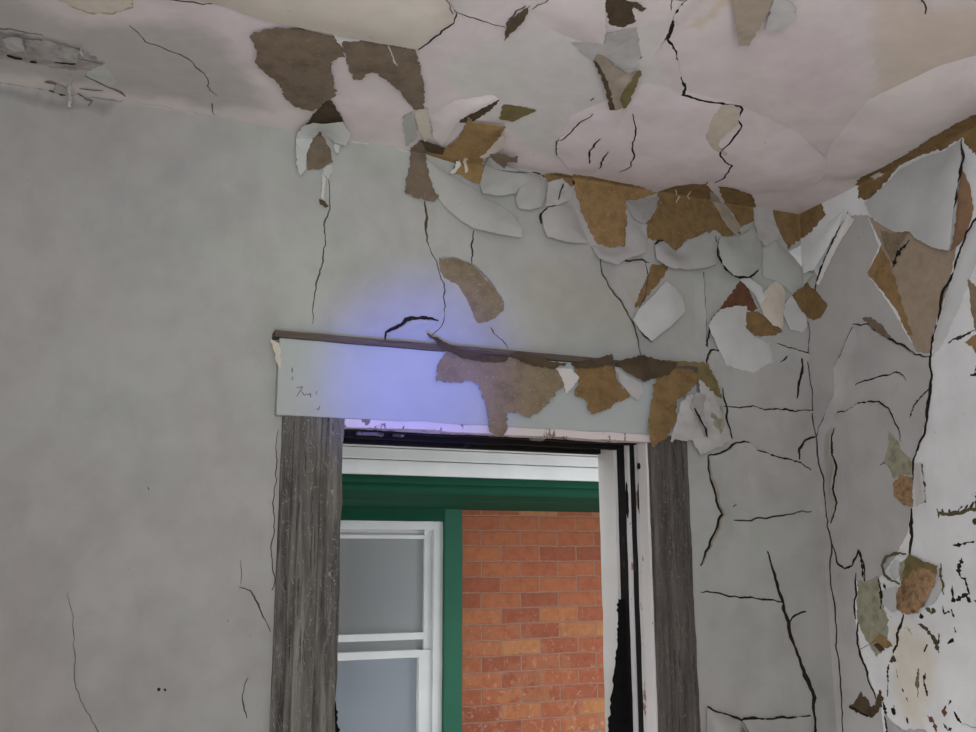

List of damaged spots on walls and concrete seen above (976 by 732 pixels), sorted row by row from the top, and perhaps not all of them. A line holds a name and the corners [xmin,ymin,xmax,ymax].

flaking render [0,28,126,122]
crack [129,25,217,116]
peeling [250,27,536,245]
crack [654,0,744,184]
crack [954,139,965,206]
crack [312,180,331,324]
crack [384,245,446,341]
peeling [439,231,505,323]
peeling [270,339,317,397]
peeling [427,333,722,447]
peeling [504,0,976,732]
crack [694,212,976,732]